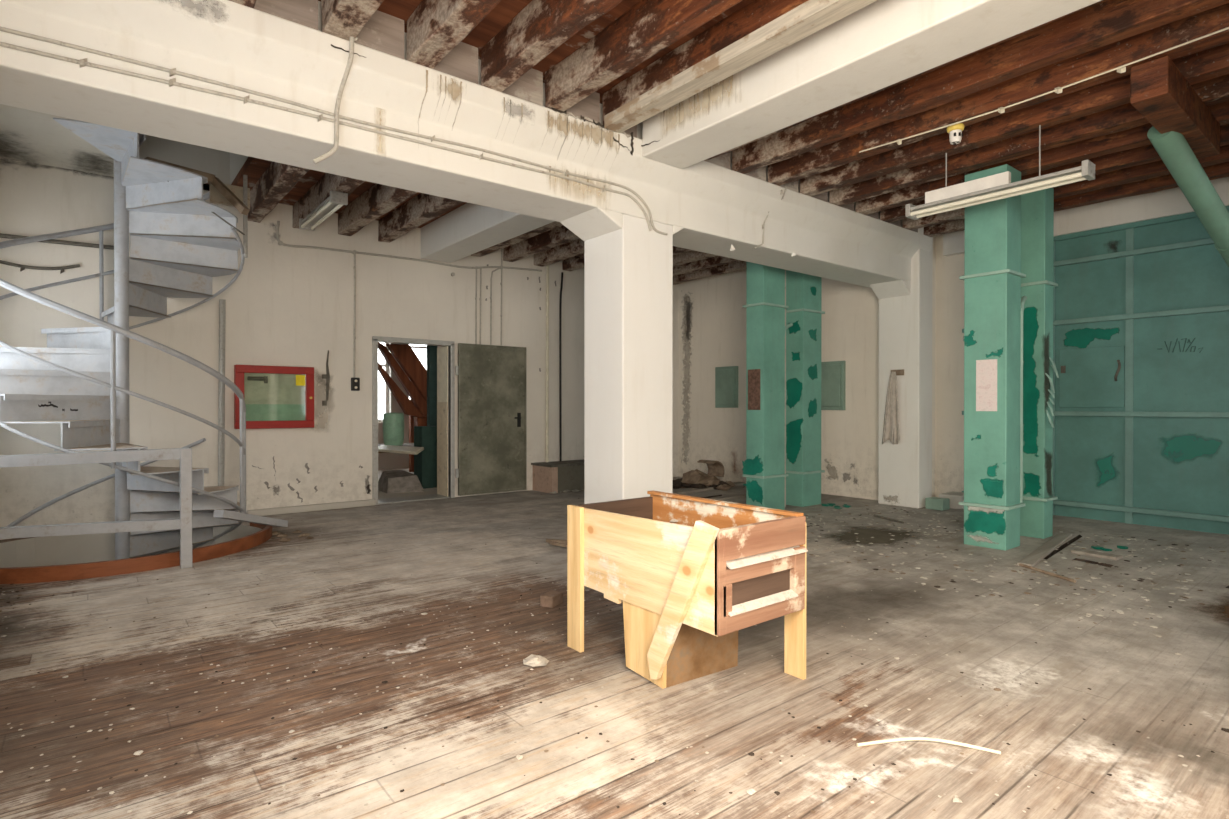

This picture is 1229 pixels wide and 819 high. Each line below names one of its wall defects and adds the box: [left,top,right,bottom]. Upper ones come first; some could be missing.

leakage [175,0,222,19]
leakage [419,70,462,117]
leakage [504,97,531,118]
leakage [548,111,620,148]
peeling [788,321,817,341]
peeling [963,330,977,347]
peeling [786,352,818,464]
peeling [1023,307,1120,497]
peeling [1162,434,1222,463]
peeling [964,463,1006,543]